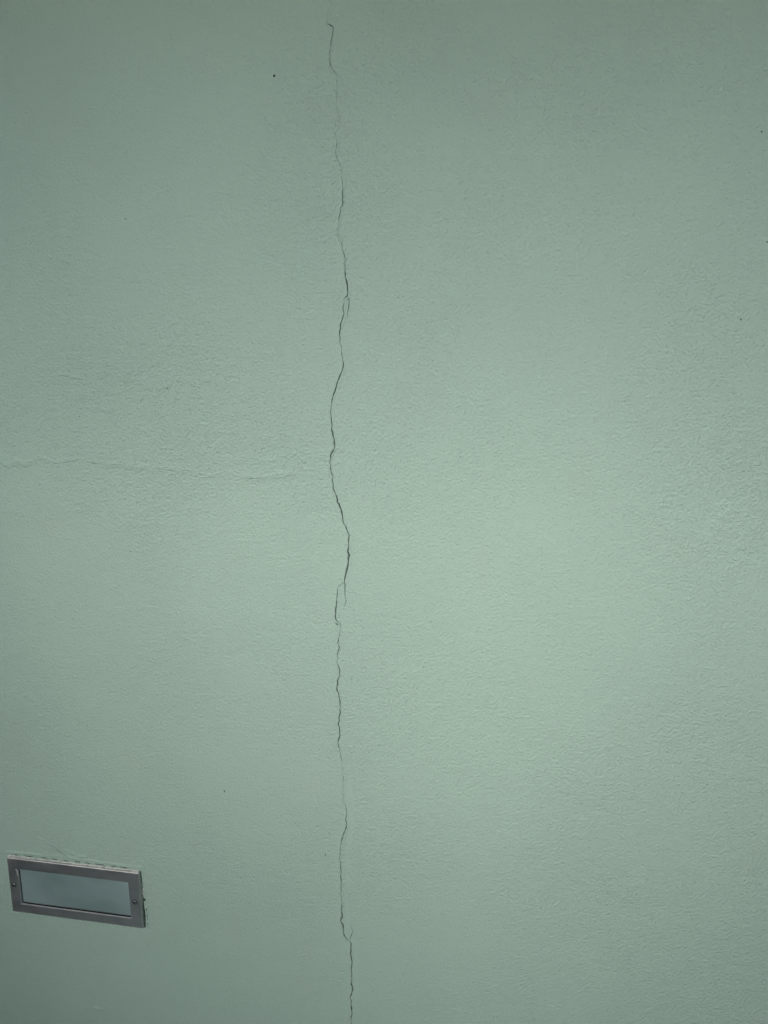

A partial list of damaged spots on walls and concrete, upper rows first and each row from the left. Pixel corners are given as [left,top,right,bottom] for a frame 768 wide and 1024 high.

crack [324,0,355,1024]